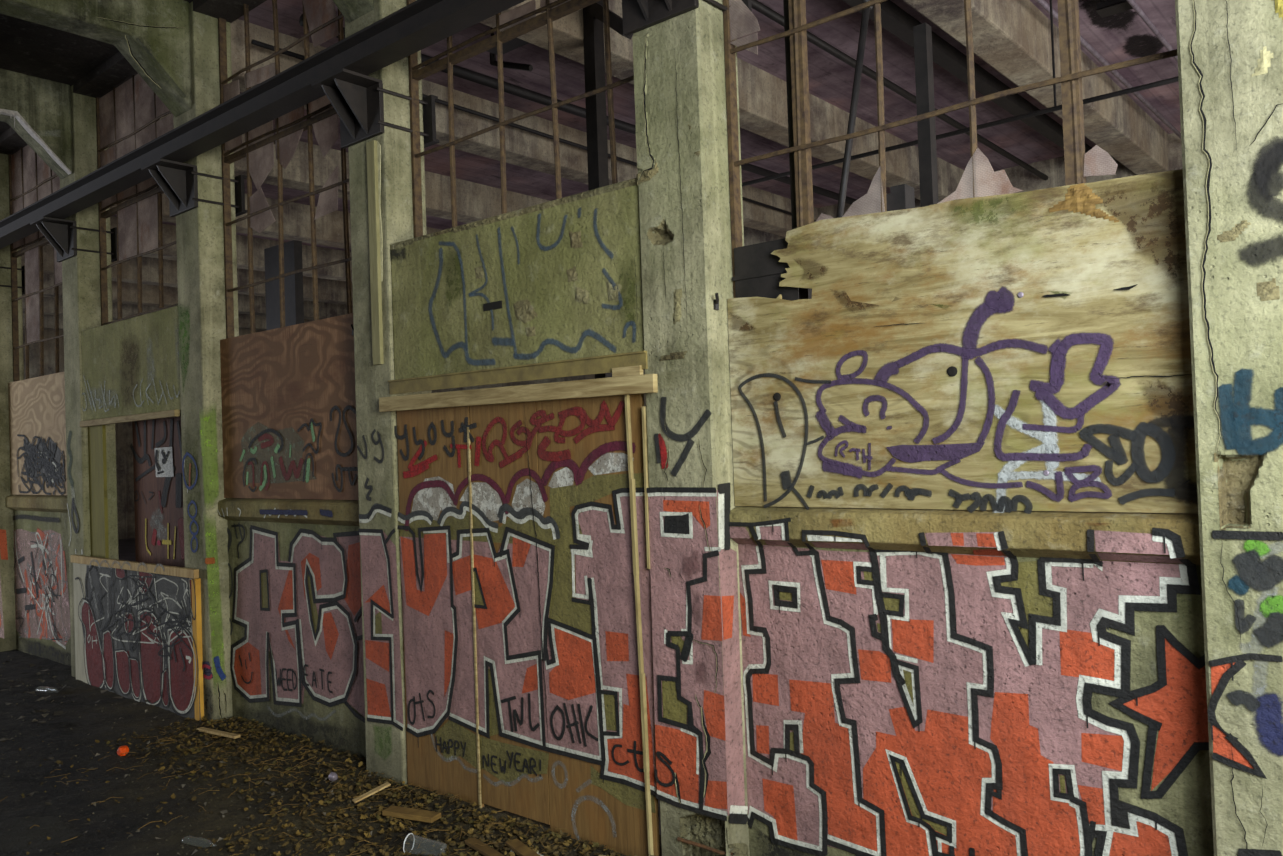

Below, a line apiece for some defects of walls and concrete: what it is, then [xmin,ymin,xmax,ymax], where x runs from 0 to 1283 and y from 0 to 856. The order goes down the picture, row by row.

leakage [1079,0,1164,57]
spalling [377,141,658,281]
spalling [646,219,673,245]
crack [634,33,688,345]
crack [1111,0,1283,452]
crack [1042,291,1069,299]
spalling [1214,453,1264,530]
leakage [185,409,225,717]
crack [1220,549,1242,648]